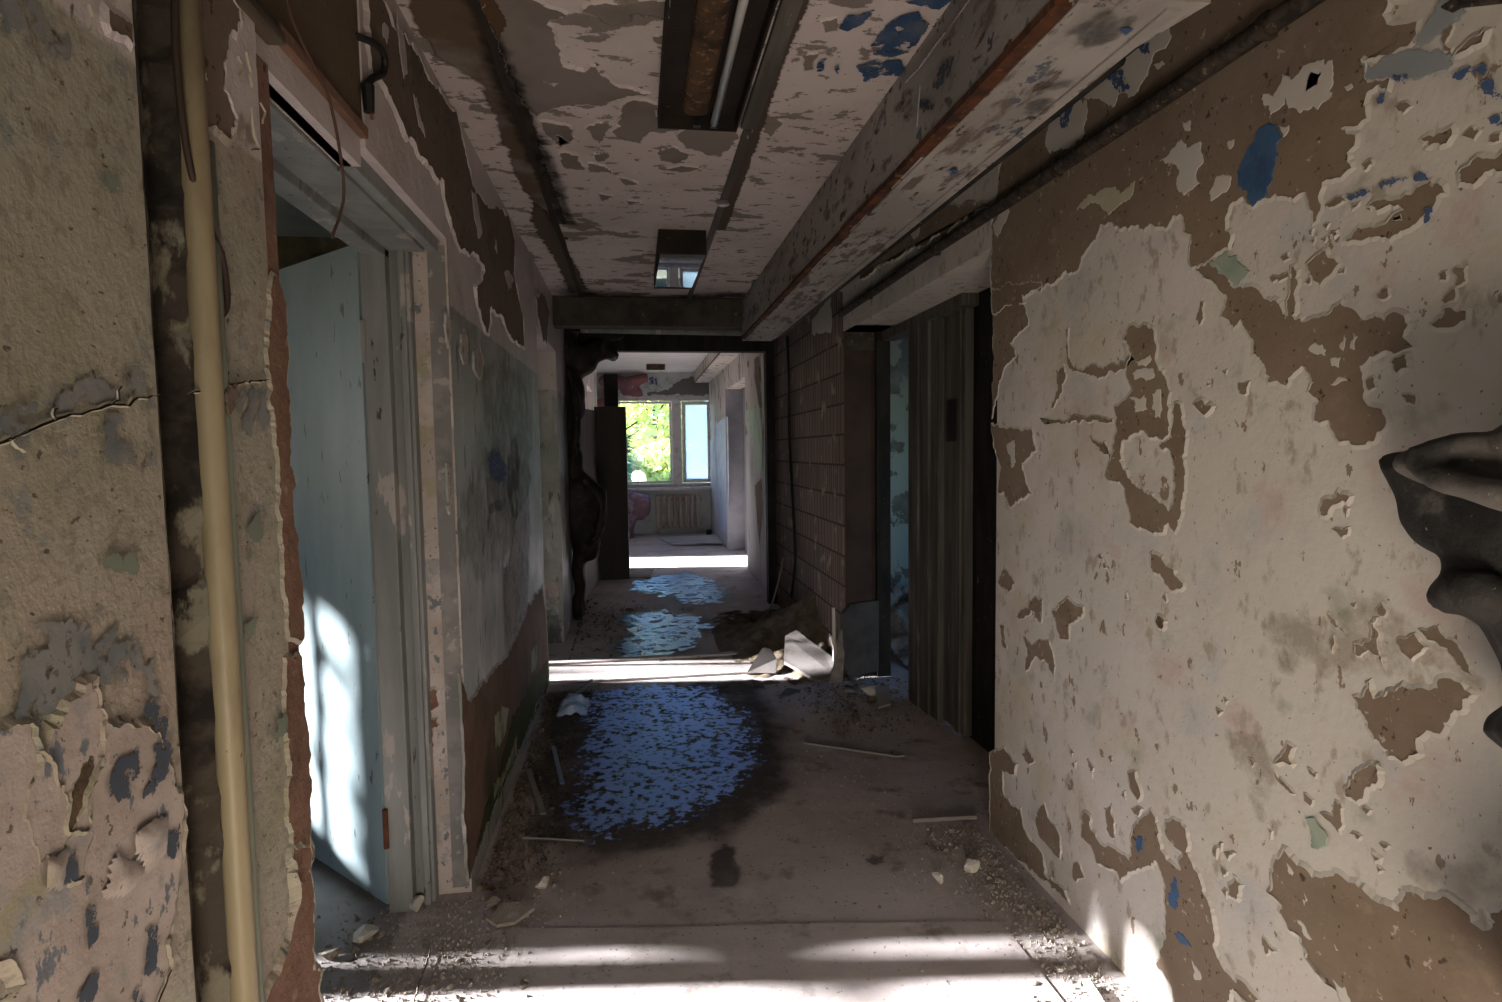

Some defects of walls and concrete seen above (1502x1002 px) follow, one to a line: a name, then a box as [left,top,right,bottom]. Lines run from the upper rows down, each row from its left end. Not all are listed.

peeling [99,0,135,52]
peeling [201,0,243,147]
peeling [362,0,550,380]
peeling [482,0,741,205]
peeling [801,52,819,71]
crack [0,371,270,453]
peeling [812,0,1502,633]
spalling [263,271,325,1002]
peeling [999,595,1086,681]
spalling [63,755,95,837]
peeling [989,744,1263,1002]
peeling [1248,600,1502,1002]